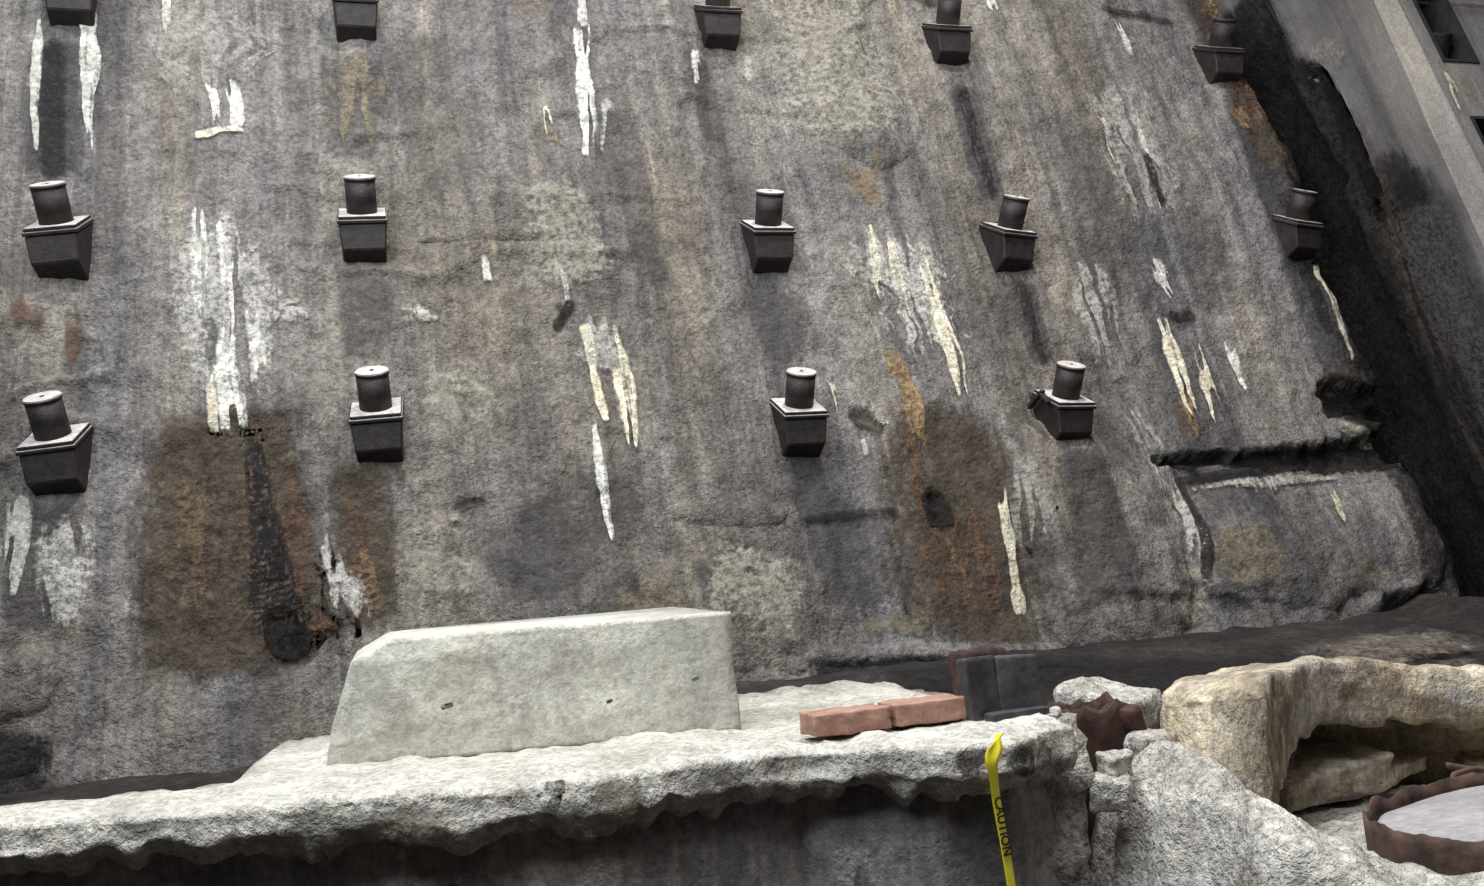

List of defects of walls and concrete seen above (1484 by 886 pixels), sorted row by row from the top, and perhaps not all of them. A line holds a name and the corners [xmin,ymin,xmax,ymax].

damp [25,13,101,176]
efflorescence [573,0,611,155]
damp [1087,86,1177,208]
efflorescence [170,207,308,431]
efflorescence [851,225,969,395]
damp [1153,258,1173,298]
damp [1157,318,1217,421]
damp [1181,0,1484,597]
damp [492,317,638,594]
corrosion [869,351,1054,643]
crack [1155,436,1403,582]
corrosion [621,574,687,611]